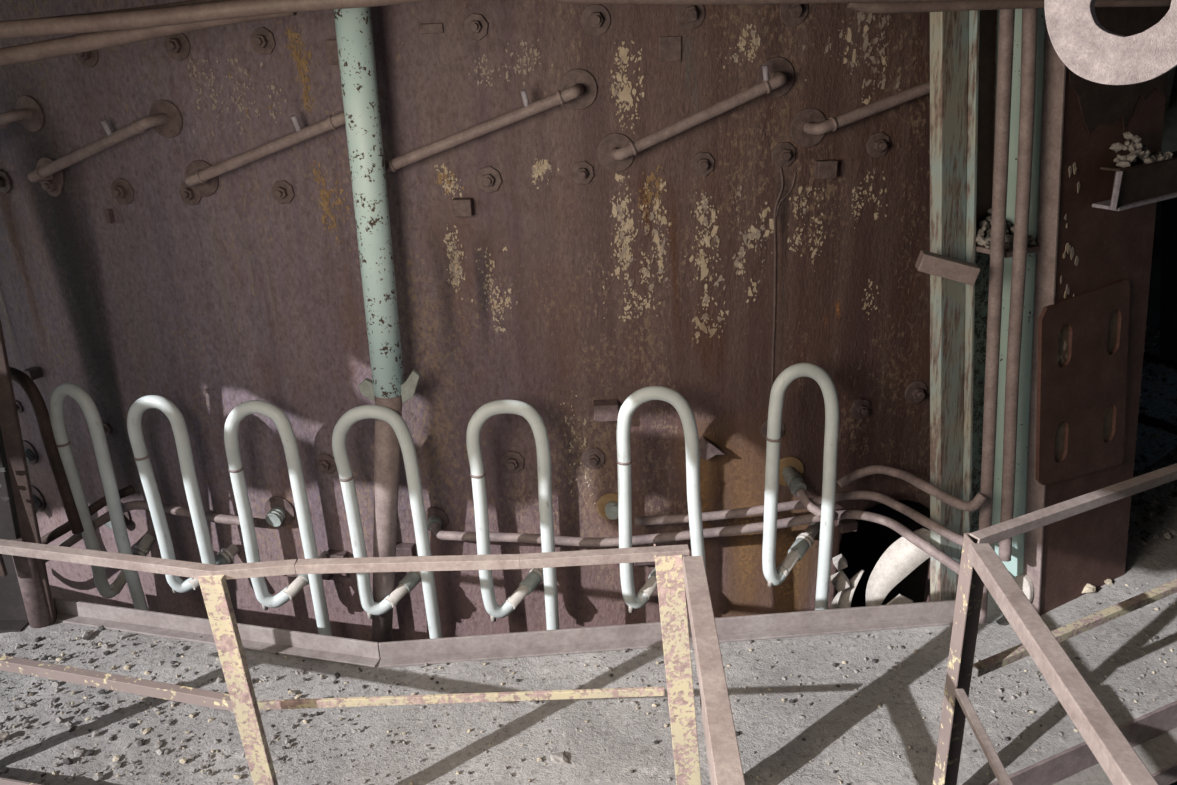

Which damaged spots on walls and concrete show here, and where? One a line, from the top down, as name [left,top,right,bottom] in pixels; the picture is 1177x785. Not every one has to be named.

peeling [610,40,644,134]
peeling [723,24,760,68]
peeling [824,12,901,105]
peeling [434,163,468,199]
peeling [443,225,518,335]
peeling [602,165,672,322]
peeling [684,186,774,344]
peeling [787,186,826,272]
peeling [851,168,888,229]
rust [700,459,714,539]
rust [732,467,758,607]
rust [774,525,808,613]